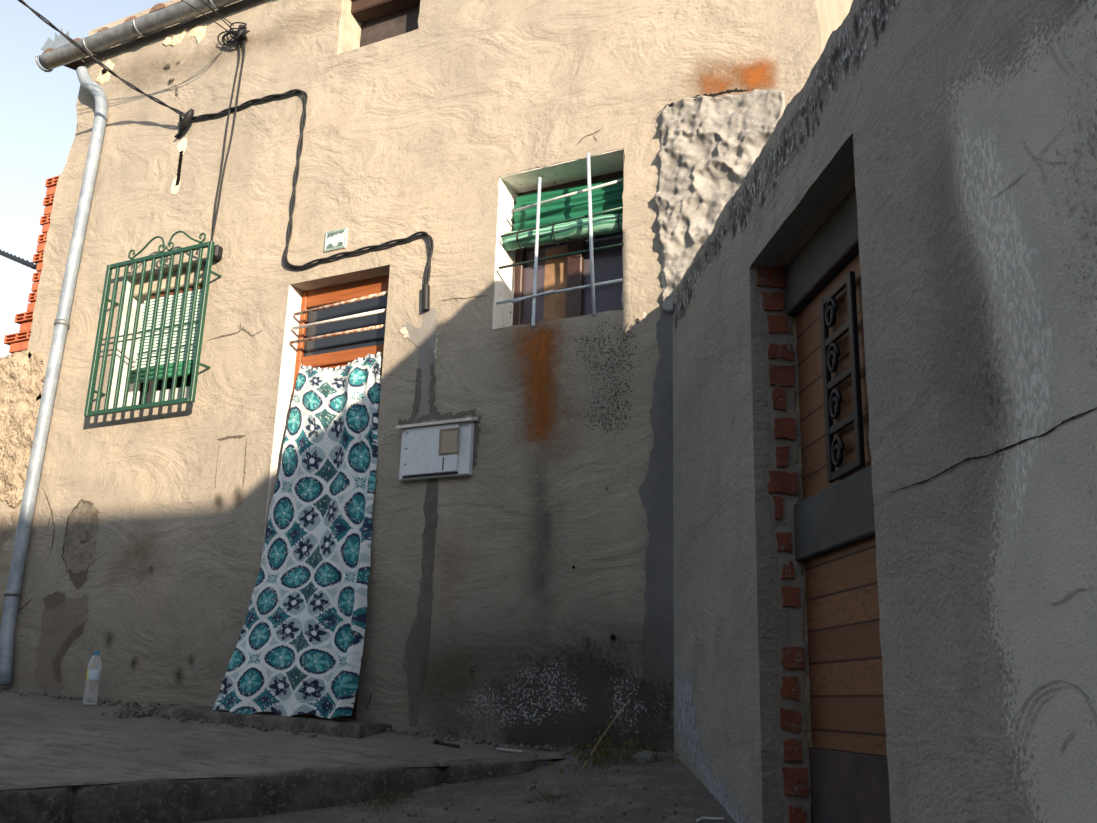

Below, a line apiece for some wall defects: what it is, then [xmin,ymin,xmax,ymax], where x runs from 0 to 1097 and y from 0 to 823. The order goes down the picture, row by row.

spalling [657,88,750,114]
corrosion [699,62,771,91]
peeling [672,0,899,327]
corrosion [522,329,555,439]
damp [563,322,639,433]
crack [874,407,1097,505]
flaking render [35,498,100,689]
damp [437,638,748,823]